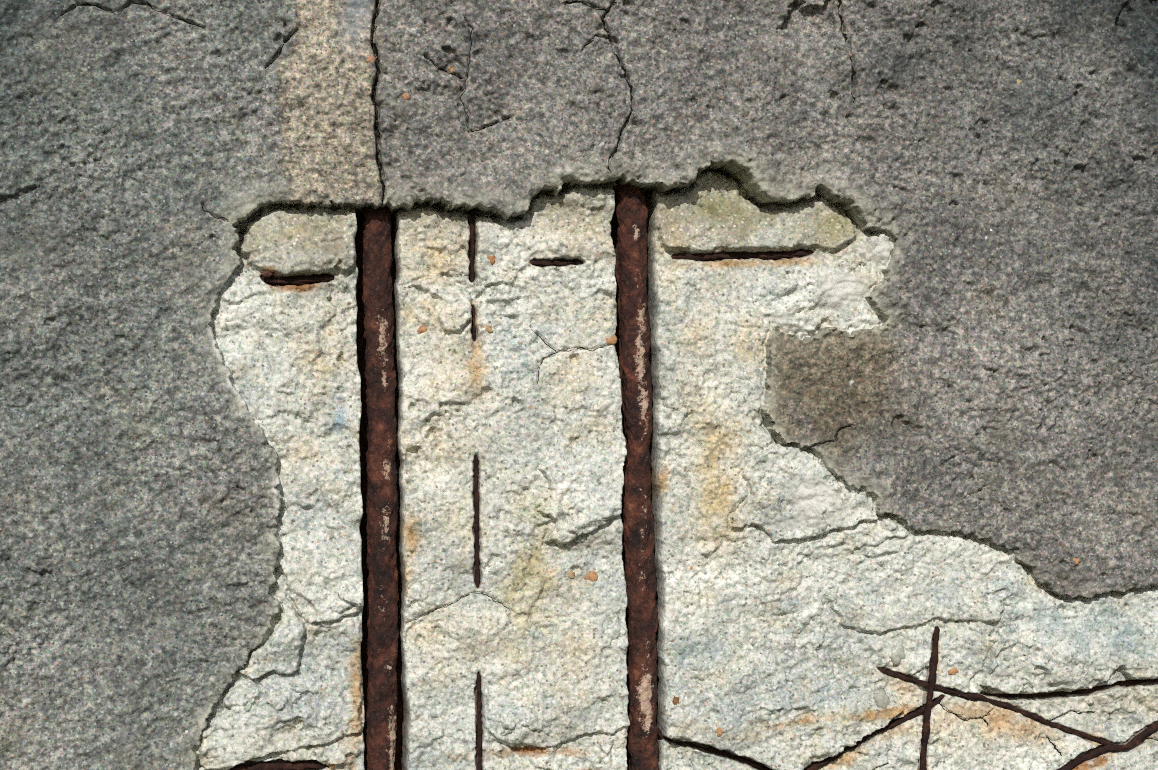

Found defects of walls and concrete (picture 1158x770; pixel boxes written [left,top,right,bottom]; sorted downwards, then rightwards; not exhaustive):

crack [62,3,205,28]
crack [371,0,385,204]
crack [563,1,633,171]
flaking render [777,0,838,42]
crack [837,0,856,103]
spalling [192,0,632,770]
spalling [616,169,1158,770]
crack [933,699,990,727]
crack [1047,711,1094,756]